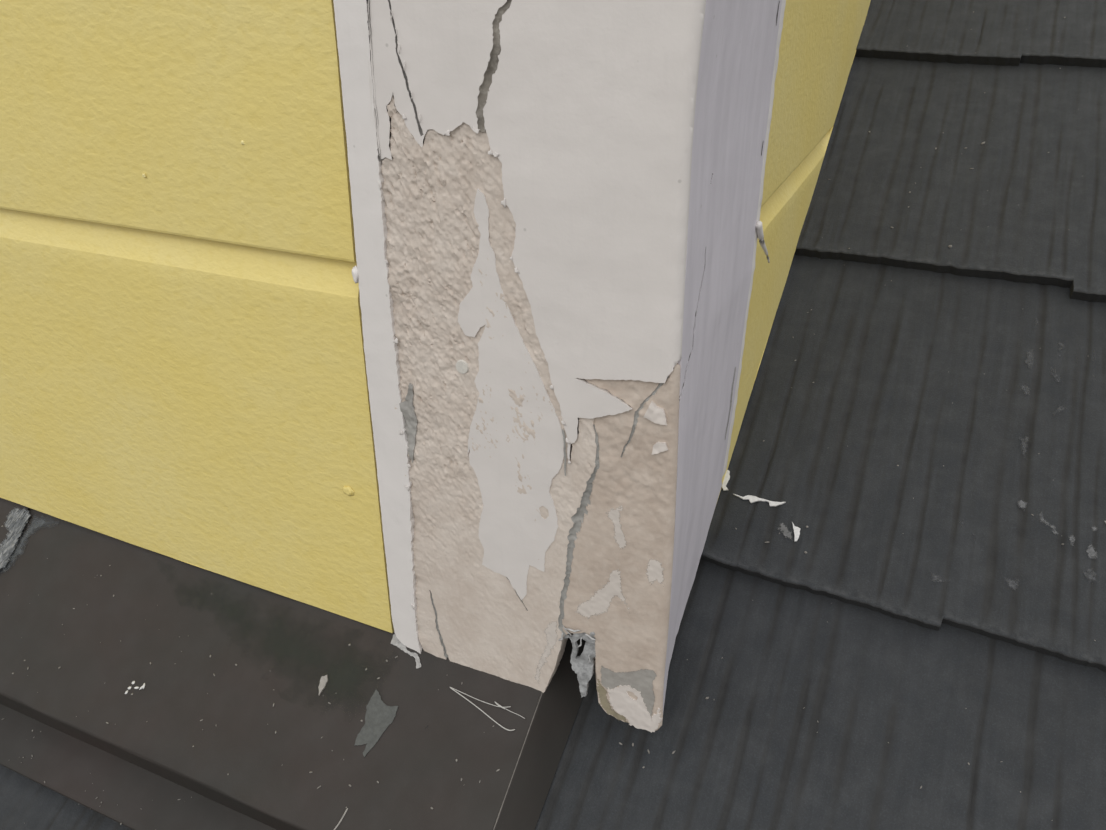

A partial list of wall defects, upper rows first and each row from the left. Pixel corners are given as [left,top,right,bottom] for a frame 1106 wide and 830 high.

crack [367,0,424,161]
crack [475,0,512,132]
spalling [378,95,680,733]